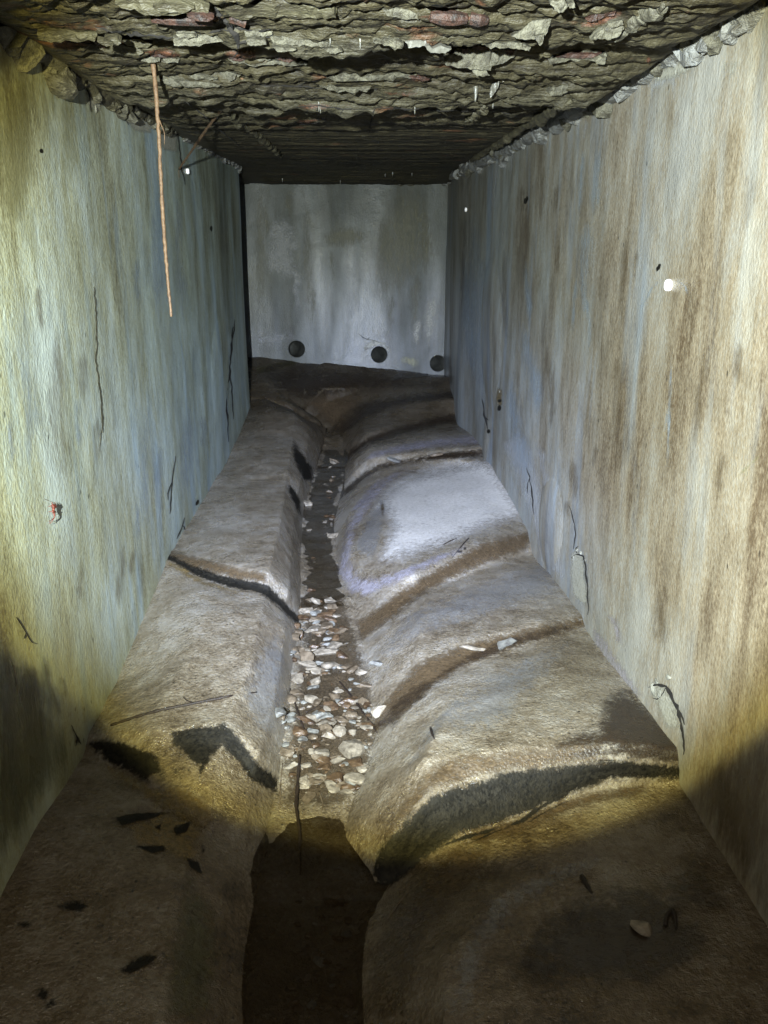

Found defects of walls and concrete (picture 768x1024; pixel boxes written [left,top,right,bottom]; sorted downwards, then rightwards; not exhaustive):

spalling [0,0,343,174]
spalling [319,72,430,95]
spalling [373,0,575,98]
spalling [442,0,767,186]
crack [93,287,103,446]
crack [226,322,235,442]
crack [167,460,185,538]
crack [526,468,534,513]
crack [569,507,589,615]
leakage [398,635,680,859]
crack [648,684,685,755]